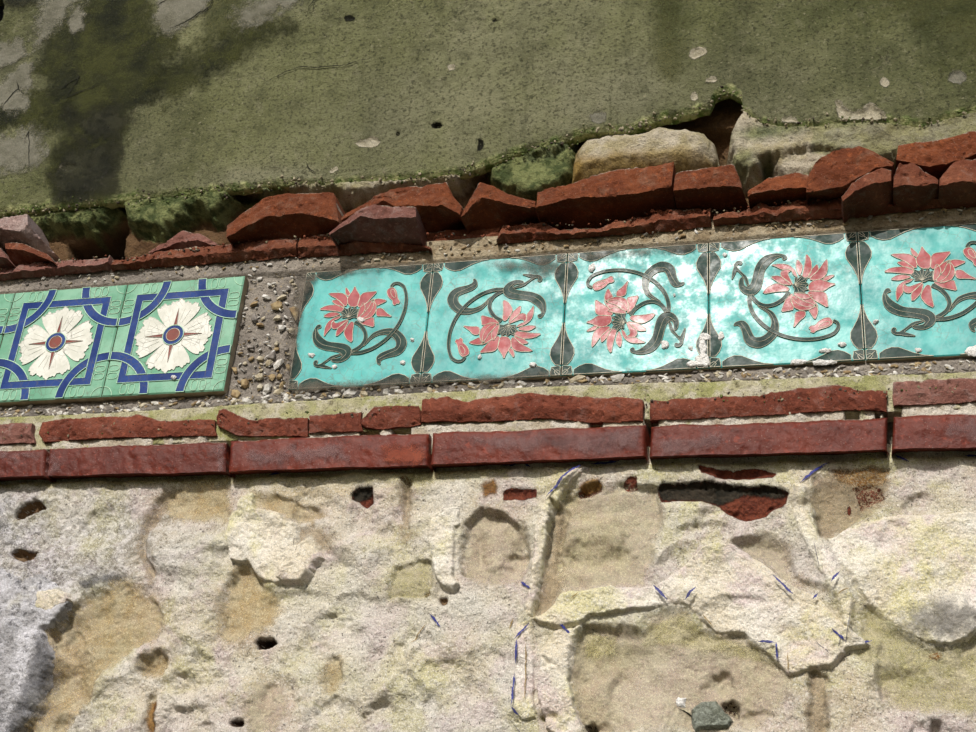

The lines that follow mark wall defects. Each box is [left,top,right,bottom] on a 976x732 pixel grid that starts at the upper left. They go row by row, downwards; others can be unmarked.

peeling [0,126,49,175]
water stain [47,99,129,205]
spalling [355,136,381,148]
spalling [835,100,887,120]
peeling [503,465,976,732]
water stain [5,633,52,732]